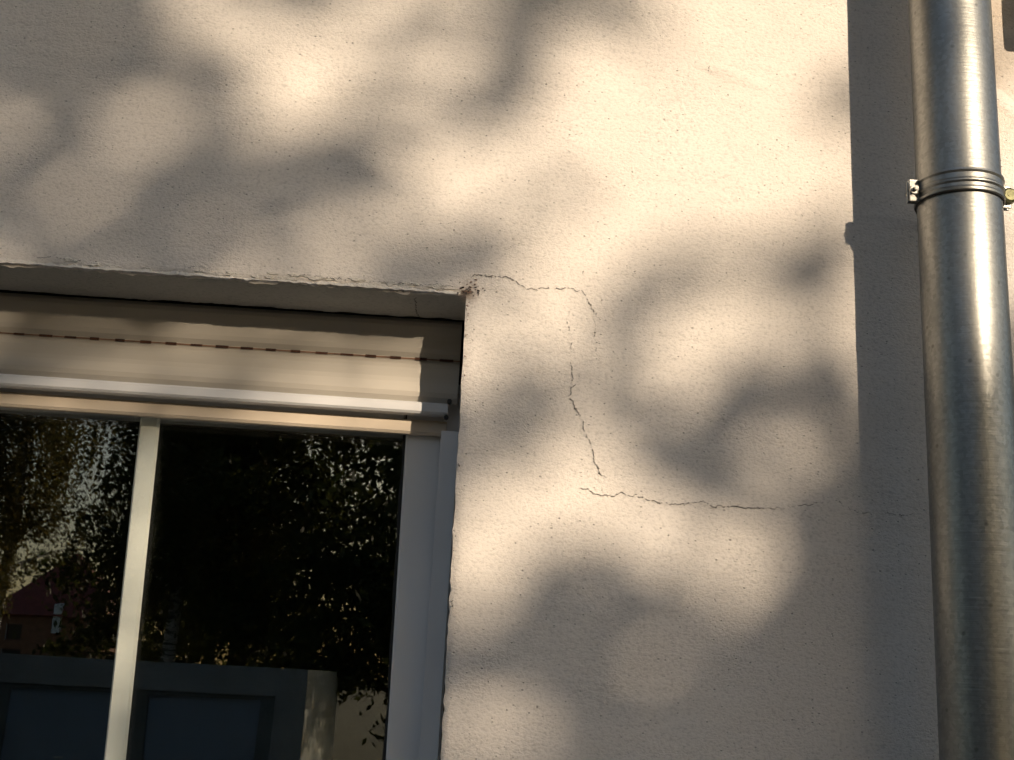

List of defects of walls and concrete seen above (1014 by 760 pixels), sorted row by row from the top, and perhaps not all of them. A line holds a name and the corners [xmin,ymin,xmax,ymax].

crack [471,274,912,516]